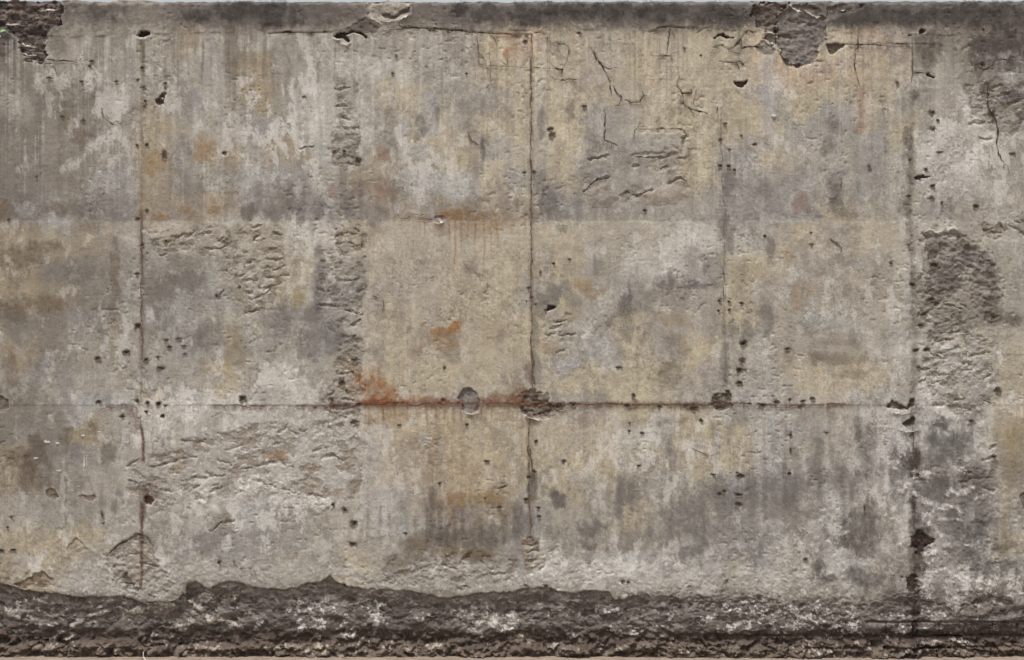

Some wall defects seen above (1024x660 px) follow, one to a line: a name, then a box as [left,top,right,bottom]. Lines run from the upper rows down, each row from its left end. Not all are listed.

spalling [0,0,64,65]
spalling [334,0,410,47]
spalling [750,2,864,67]
crack [385,21,821,149]
crack [970,59,1014,170]
spalling [910,227,1002,423]
rust [344,375,460,407]
spalling [910,530,935,556]
spalling [0,535,1024,645]